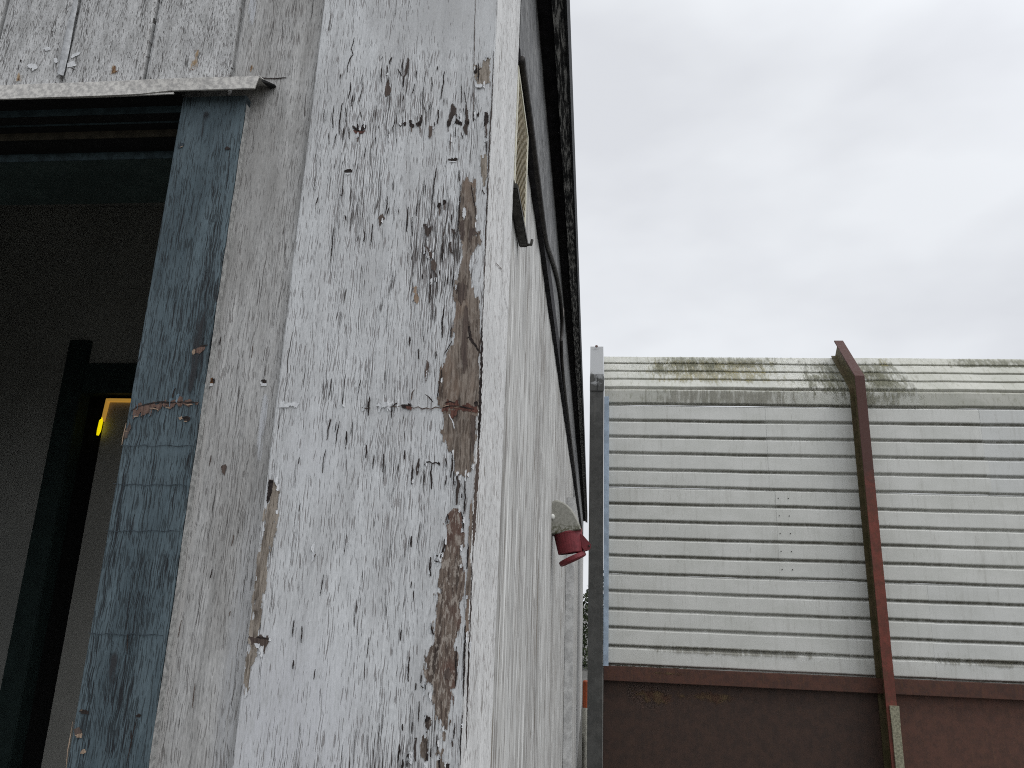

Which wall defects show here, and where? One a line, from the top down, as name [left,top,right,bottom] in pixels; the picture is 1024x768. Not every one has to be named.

crack [323,39,376,158]
peeling [381,56,392,97]
peeling [378,110,439,142]
peeling [473,55,491,89]
crack [298,58,474,473]
peeling [398,111,487,768]
peeling [243,475,280,698]